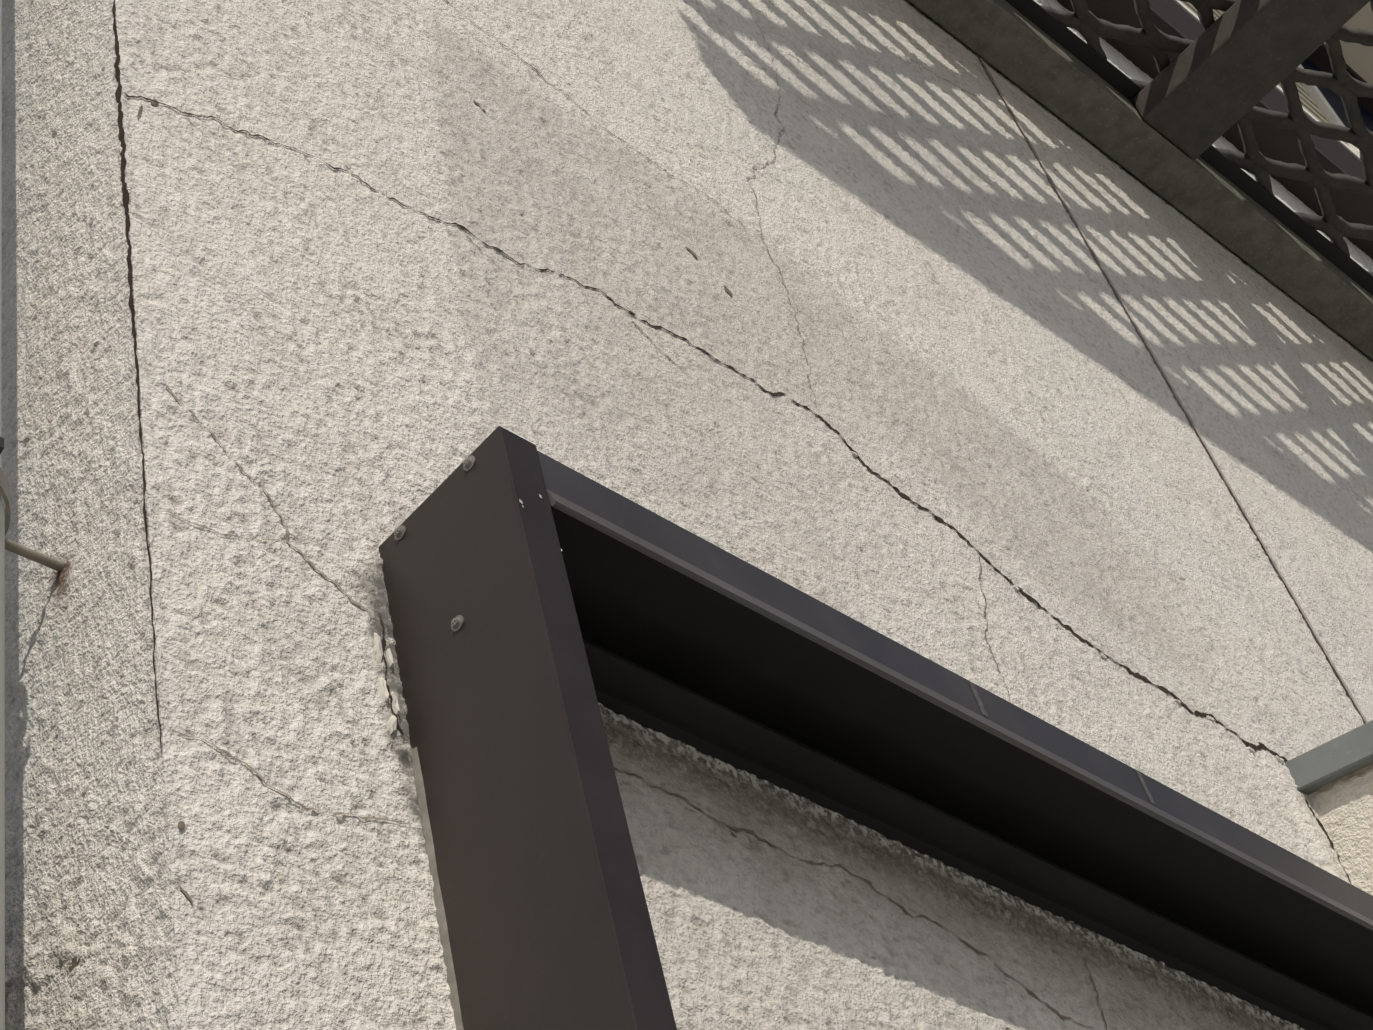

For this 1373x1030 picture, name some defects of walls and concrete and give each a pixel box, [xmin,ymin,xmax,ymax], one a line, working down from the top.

crack [112,0,1288,826]
crack [614,768,1107,1029]
crack [1301,794,1354,886]